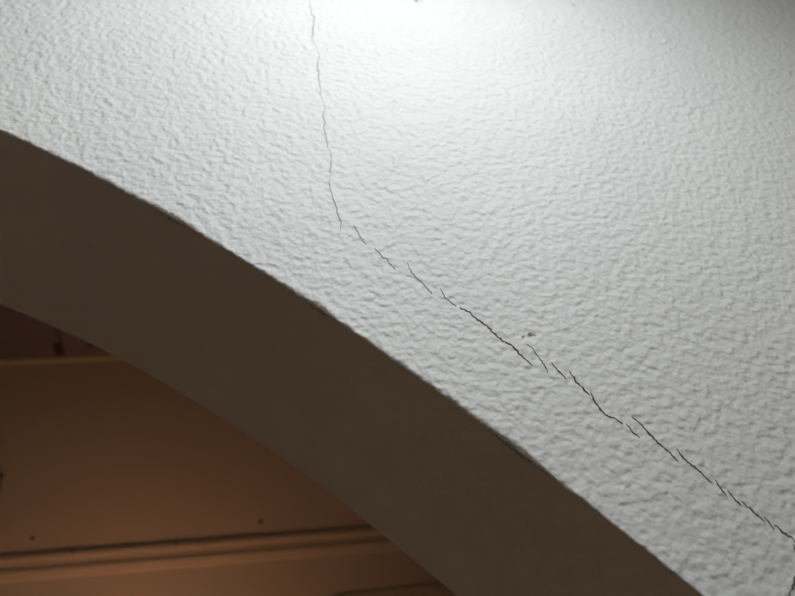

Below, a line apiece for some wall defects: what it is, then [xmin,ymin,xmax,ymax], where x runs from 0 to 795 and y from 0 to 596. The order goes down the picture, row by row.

crack [310,6,795,550]